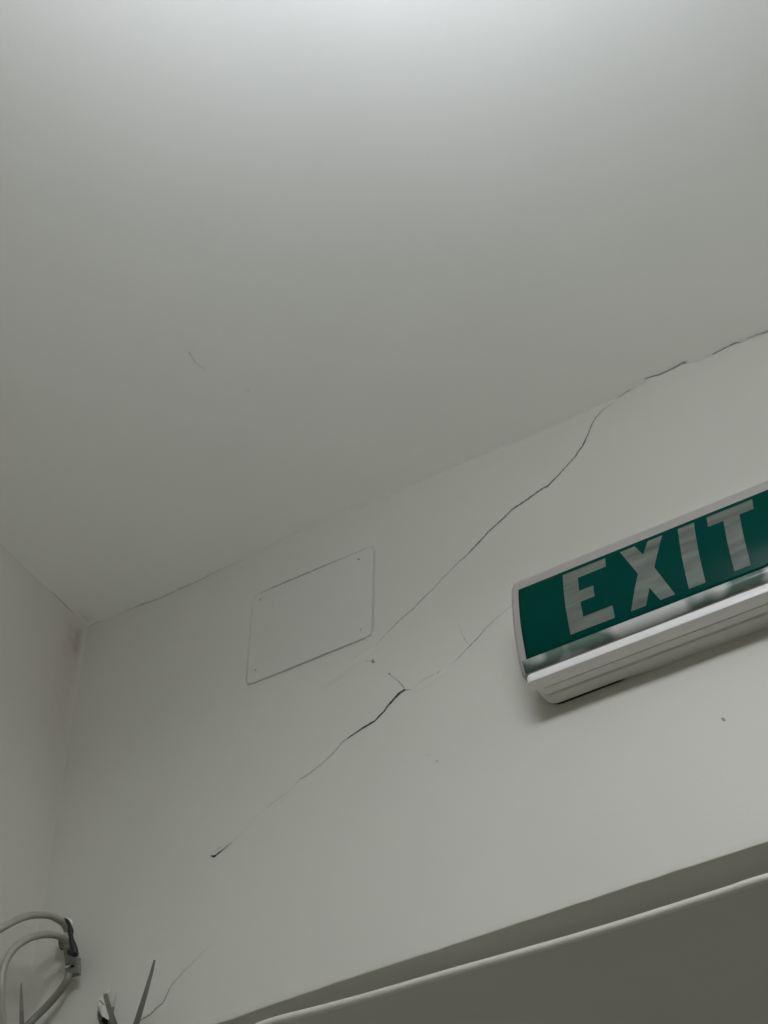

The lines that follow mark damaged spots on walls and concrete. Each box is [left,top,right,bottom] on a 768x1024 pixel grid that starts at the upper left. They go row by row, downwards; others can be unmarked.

crack [457,412,601,564]
crack [346,689,405,739]
crack [211,842,234,858]